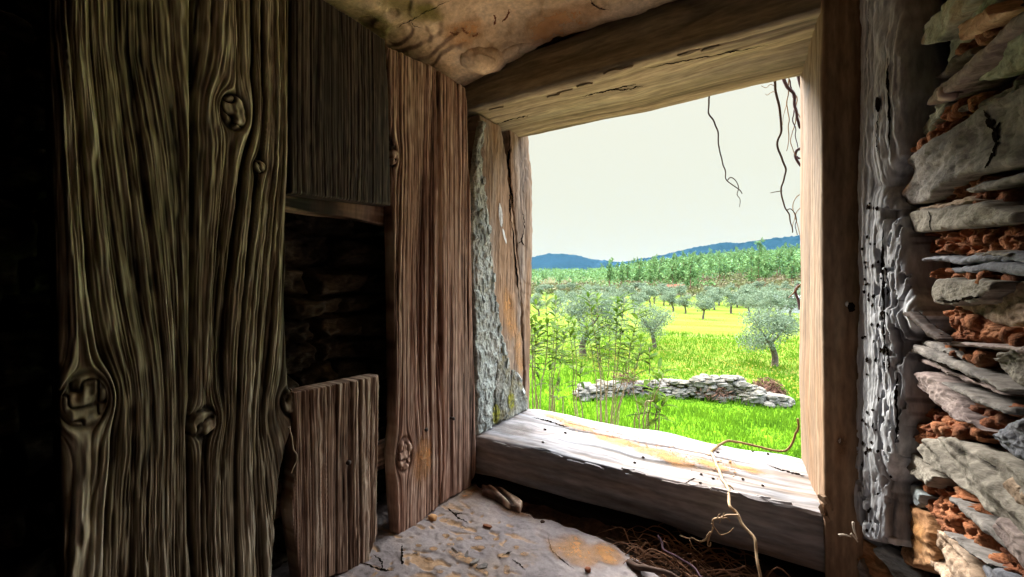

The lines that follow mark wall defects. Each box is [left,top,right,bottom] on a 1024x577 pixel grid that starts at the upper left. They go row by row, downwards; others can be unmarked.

crack [498,116,528,305]
crack [983,110,1000,168]